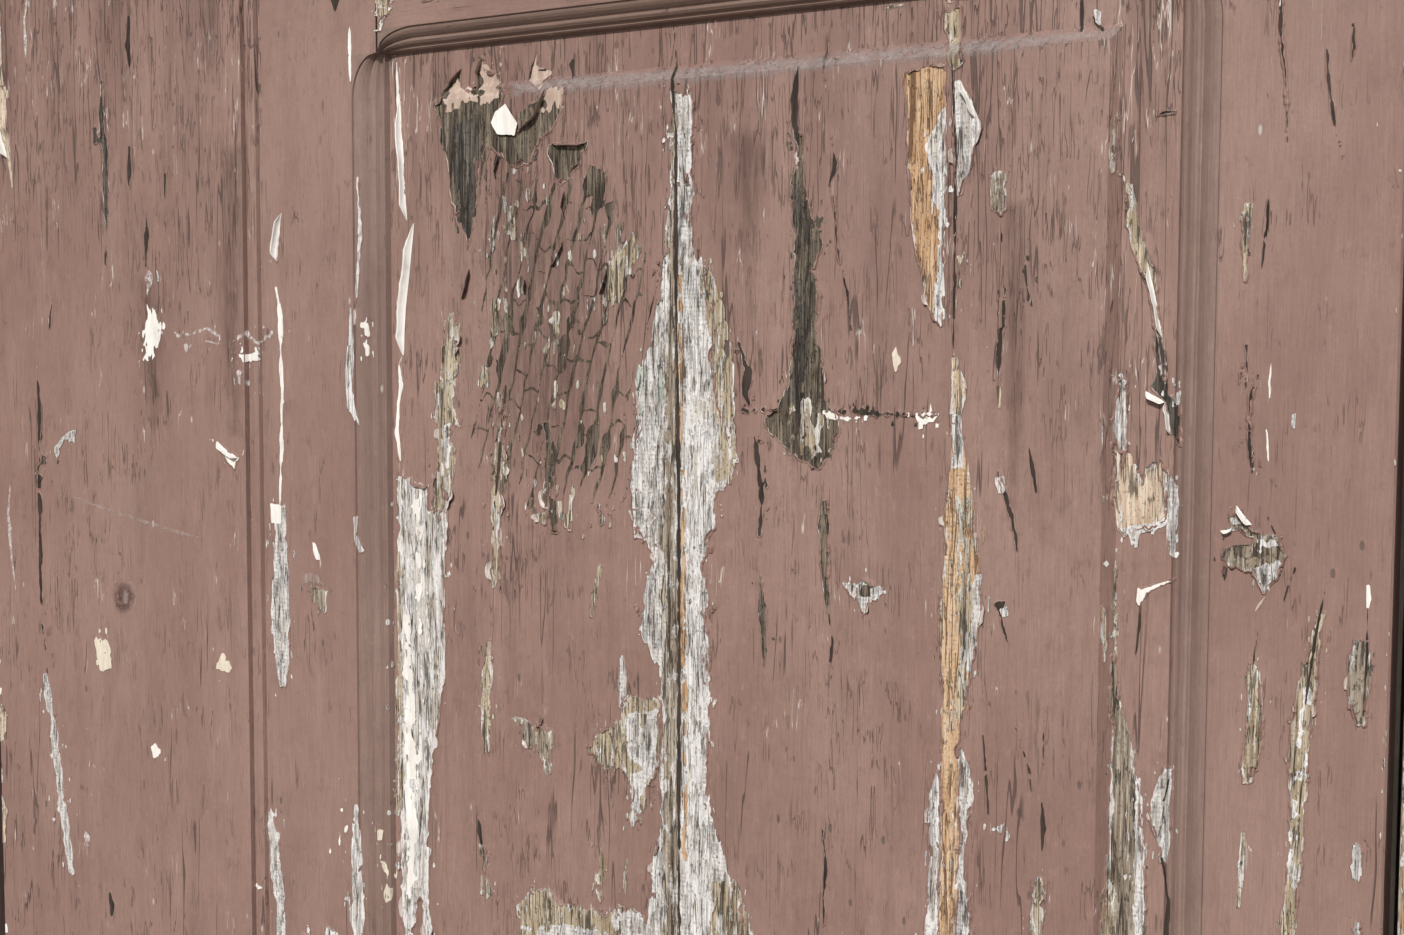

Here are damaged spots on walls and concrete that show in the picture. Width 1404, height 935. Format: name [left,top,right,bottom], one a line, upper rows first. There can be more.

crack [433,145,659,593]
peeling [1145,253,1183,448]
peeling [252,285,331,697]
peeling [1103,438,1183,558]
peeling [1221,506,1252,546]
peeling [586,693,664,831]
peeling [1135,577,1177,655]
peeling [1237,632,1271,785]
peeling [1275,583,1331,935]
peeling [1344,585,1376,730]
peeling [477,820,652,935]
peeling [1349,838,1369,883]